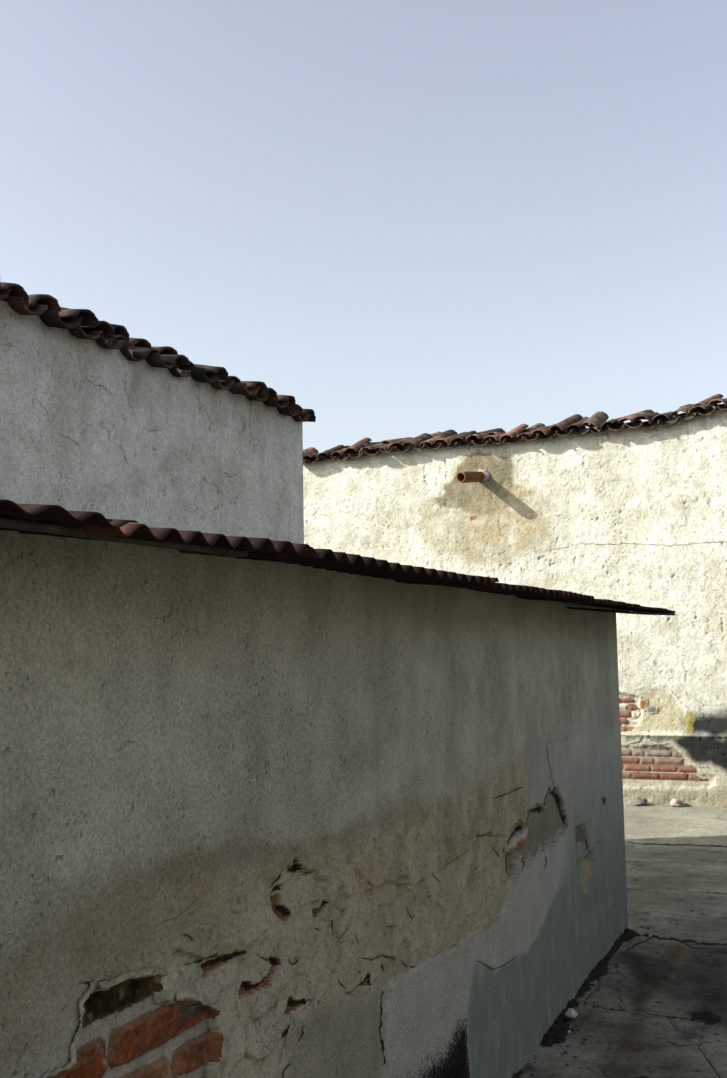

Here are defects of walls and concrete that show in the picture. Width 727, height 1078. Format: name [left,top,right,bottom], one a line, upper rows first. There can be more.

damp [415,447,558,573]
flaking render [619,684,717,787]
flaking render [200,950,248,979]
flaking render [270,885,291,922]
flaking render [287,859,307,874]
flaking render [312,901,328,920]
peeling [352,785,590,1073]
crack [621,926,727,965]
flaking render [42,966,232,1078]
crack [582,981,727,1078]